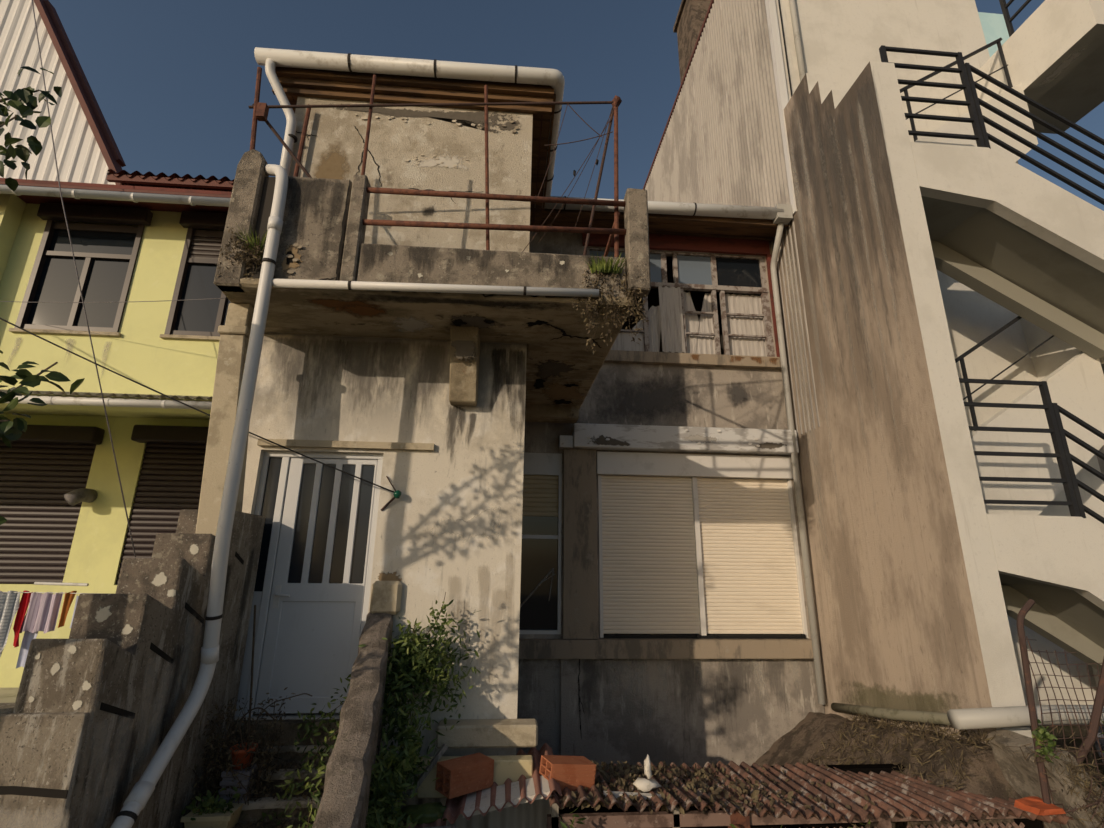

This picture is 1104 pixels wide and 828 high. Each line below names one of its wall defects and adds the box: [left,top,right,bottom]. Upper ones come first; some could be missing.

crack [319,126,382,281]
crack [476,284,608,348]
water stain [491,349,525,426]
water stain [602,377,699,421]
water stain [728,384,748,406]
water stain [448,406,476,451]
peeling [587,435,630,446]
peeling [748,438,787,449]